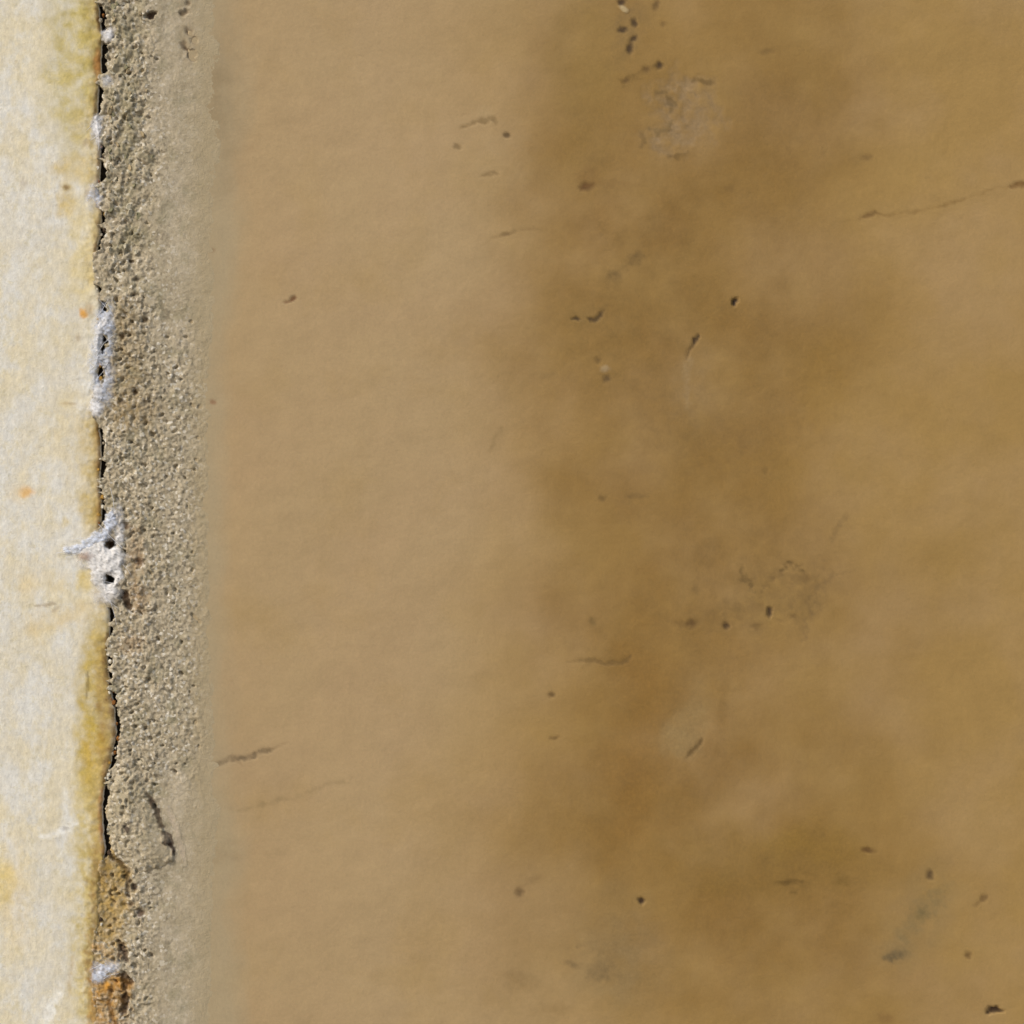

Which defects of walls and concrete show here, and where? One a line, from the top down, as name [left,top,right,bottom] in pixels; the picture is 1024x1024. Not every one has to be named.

crack [98,7,109,114]
spalling [171,0,205,78]
spalling [104,0,158,260]
crack [96,144,107,250]
water stain [23,0,103,539]
crack [96,287,109,384]
crack [97,429,108,525]
water stain [0,559,116,1024]
crack [103,608,121,855]
crack [211,741,293,777]
spalling [92,780,146,1001]
corrosion [91,940,142,1024]